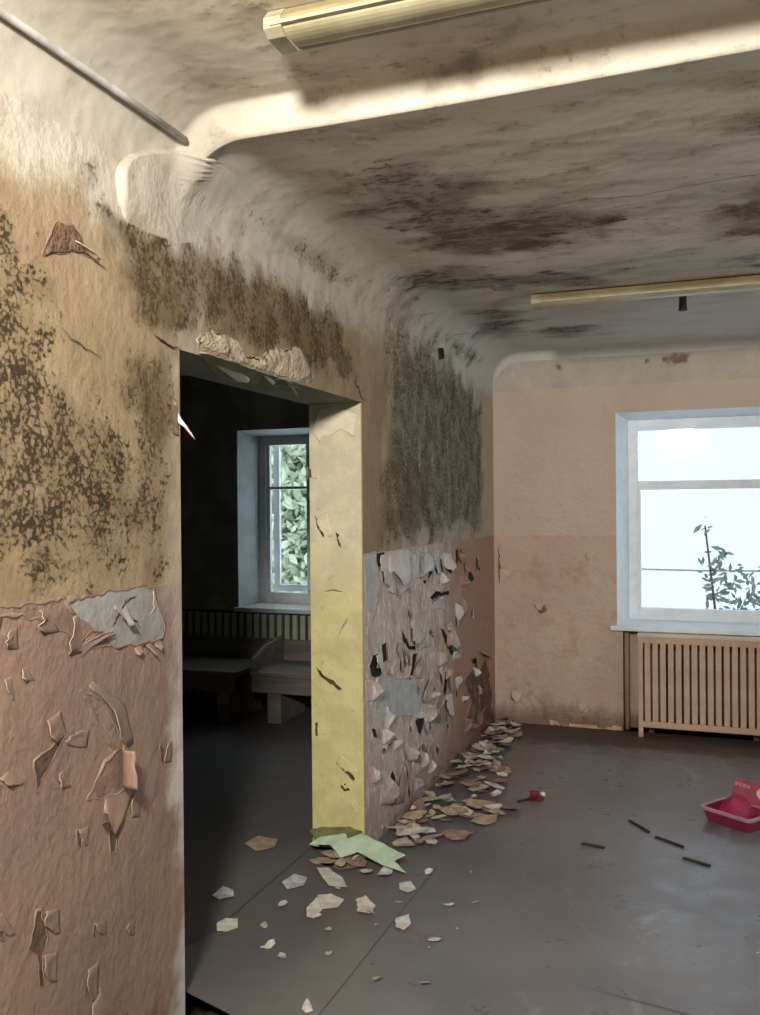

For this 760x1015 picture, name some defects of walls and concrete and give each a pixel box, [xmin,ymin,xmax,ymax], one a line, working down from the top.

water stain [330,159,626,255]
water stain [712,191,760,236]
water stain [97,203,352,378]
water stain [0,209,176,596]
water stain [379,310,531,547]
flaking render [0,584,167,658]
peeling [316,660,343,691]
peeling [336,547,495,815]
peeling [0,682,141,855]
peeling [159,742,172,764]
peeling [28,907,61,988]
peeling [87,962,128,1015]